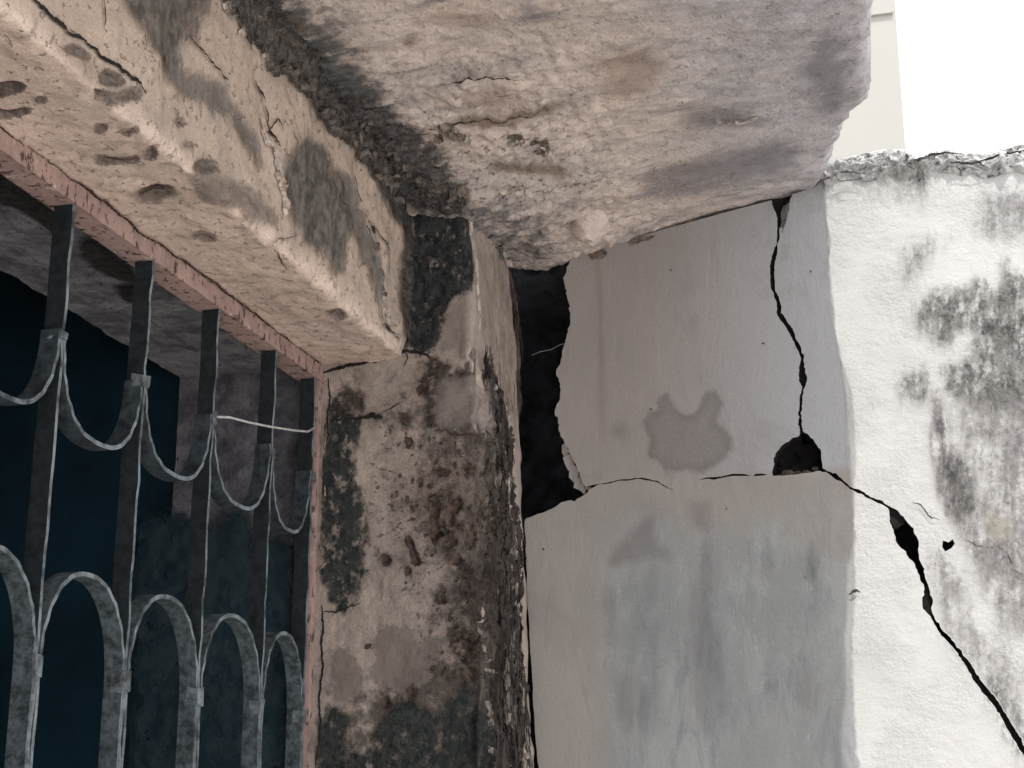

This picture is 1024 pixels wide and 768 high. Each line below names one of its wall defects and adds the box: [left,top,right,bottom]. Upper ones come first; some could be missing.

crack [34,0,147,94]
crack [429,76,524,91]
crack [427,111,540,130]
damp [194,168,279,225]
damp [285,1,475,426]
crack [770,196,807,434]
damp [904,269,1024,627]
damp [319,385,369,615]
crack [836,476,939,529]
crack [922,586,934,618]
crack [957,650,1024,755]